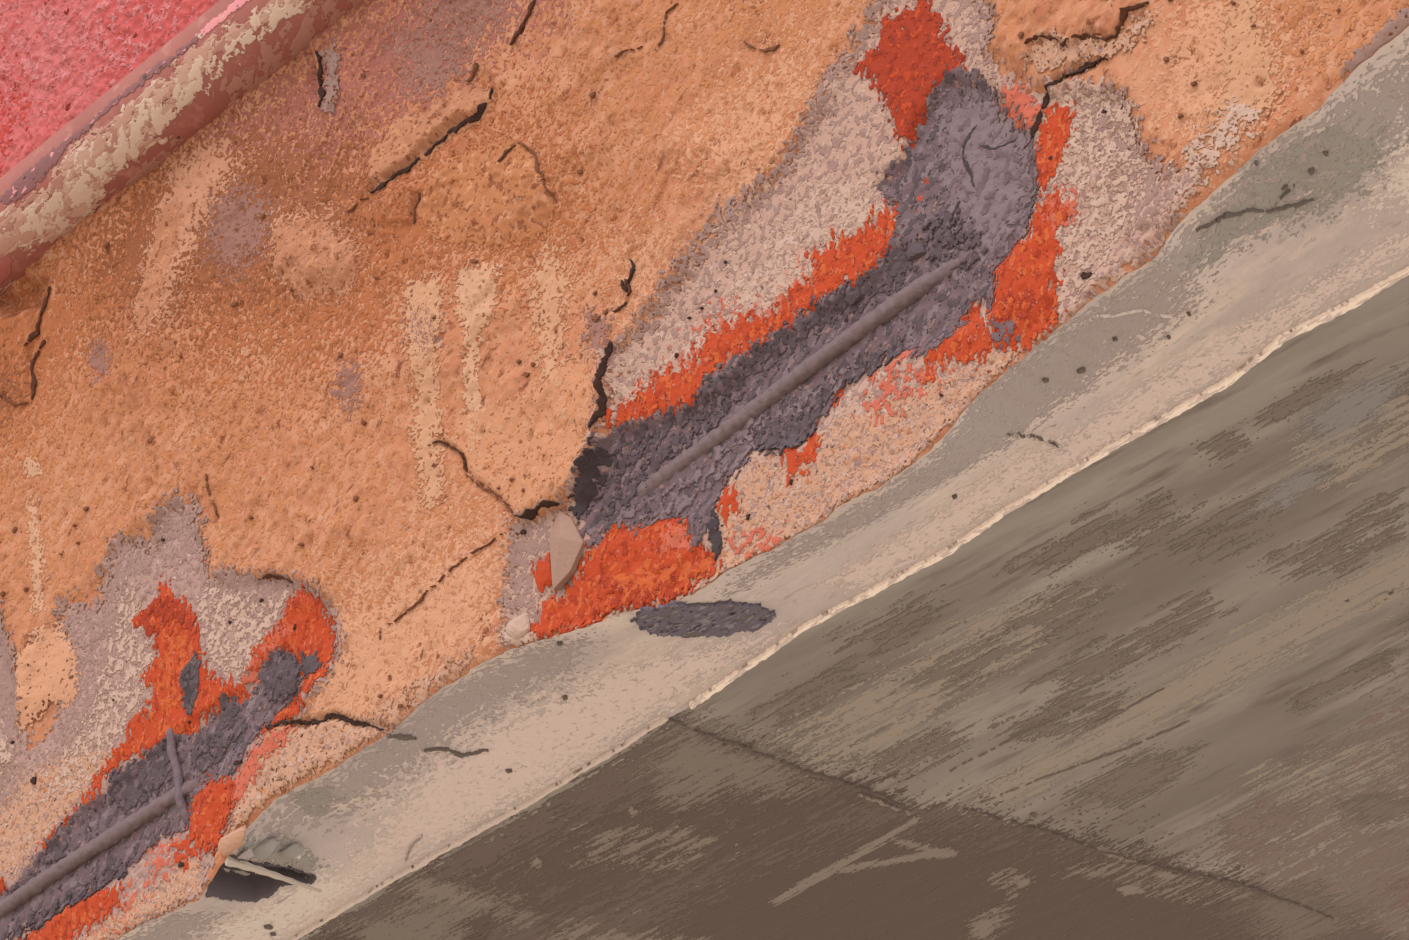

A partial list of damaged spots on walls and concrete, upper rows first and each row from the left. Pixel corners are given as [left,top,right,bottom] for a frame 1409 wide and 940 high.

crack [509,0,536,46]
crack [1024,1,1149,47]
crack [347,62,557,224]
spalling [490,0,1409,653]
crack [379,440,560,640]
spalling [0,486,475,940]
crack [259,713,489,758]